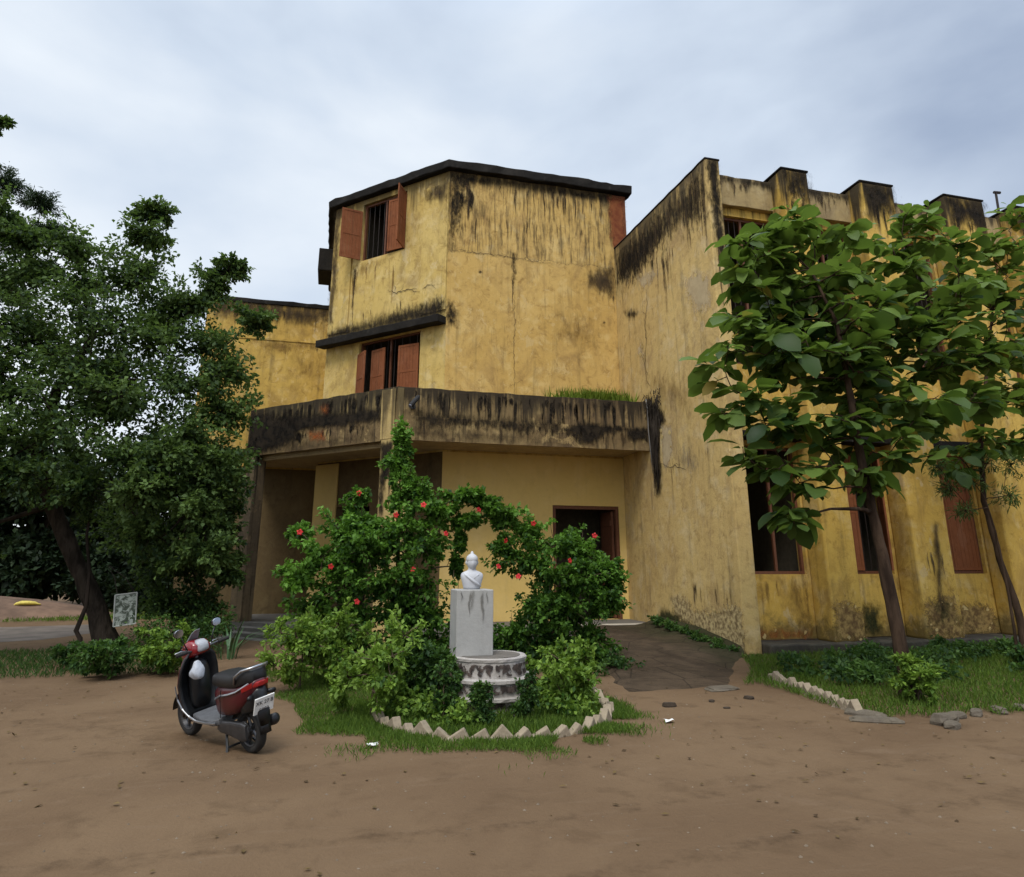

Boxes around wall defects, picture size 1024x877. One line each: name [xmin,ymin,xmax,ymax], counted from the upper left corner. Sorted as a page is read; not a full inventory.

water stain [428,173,609,242]
water stain [588,161,769,300]
water stain [782,169,847,221]
water stain [859,181,903,236]
water stain [946,197,986,234]
water stain [214,211,456,338]
water stain [415,390,672,494]
water stain [927,524,945,609]